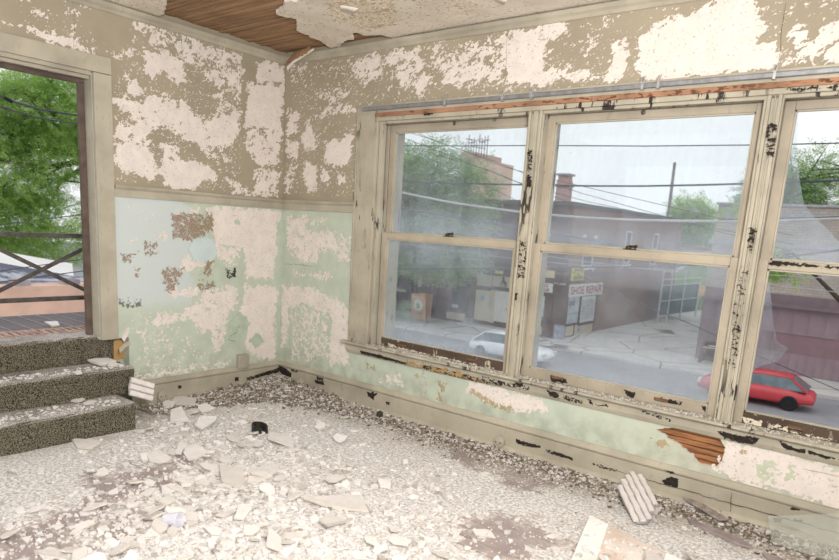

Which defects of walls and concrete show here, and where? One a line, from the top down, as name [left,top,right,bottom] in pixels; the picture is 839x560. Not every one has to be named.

peeling [1,0,839,199]
peeling [128,202,352,381]
peeling [728,267,749,368]
peeling [768,261,839,269]
peeling [360,343,608,417]
peeling [642,410,839,509]